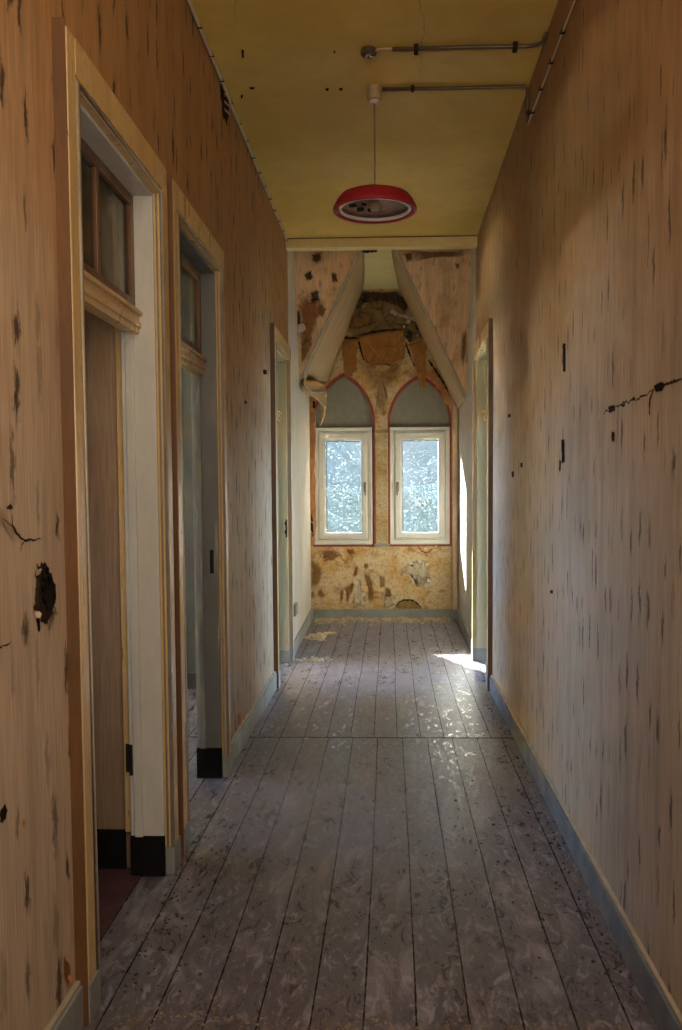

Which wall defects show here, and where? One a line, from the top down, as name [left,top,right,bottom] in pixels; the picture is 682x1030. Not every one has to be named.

spalling [403,319,425,342]
crack [6,504,42,549]
spalling [33,561,58,632]
peeling [393,557,433,609]